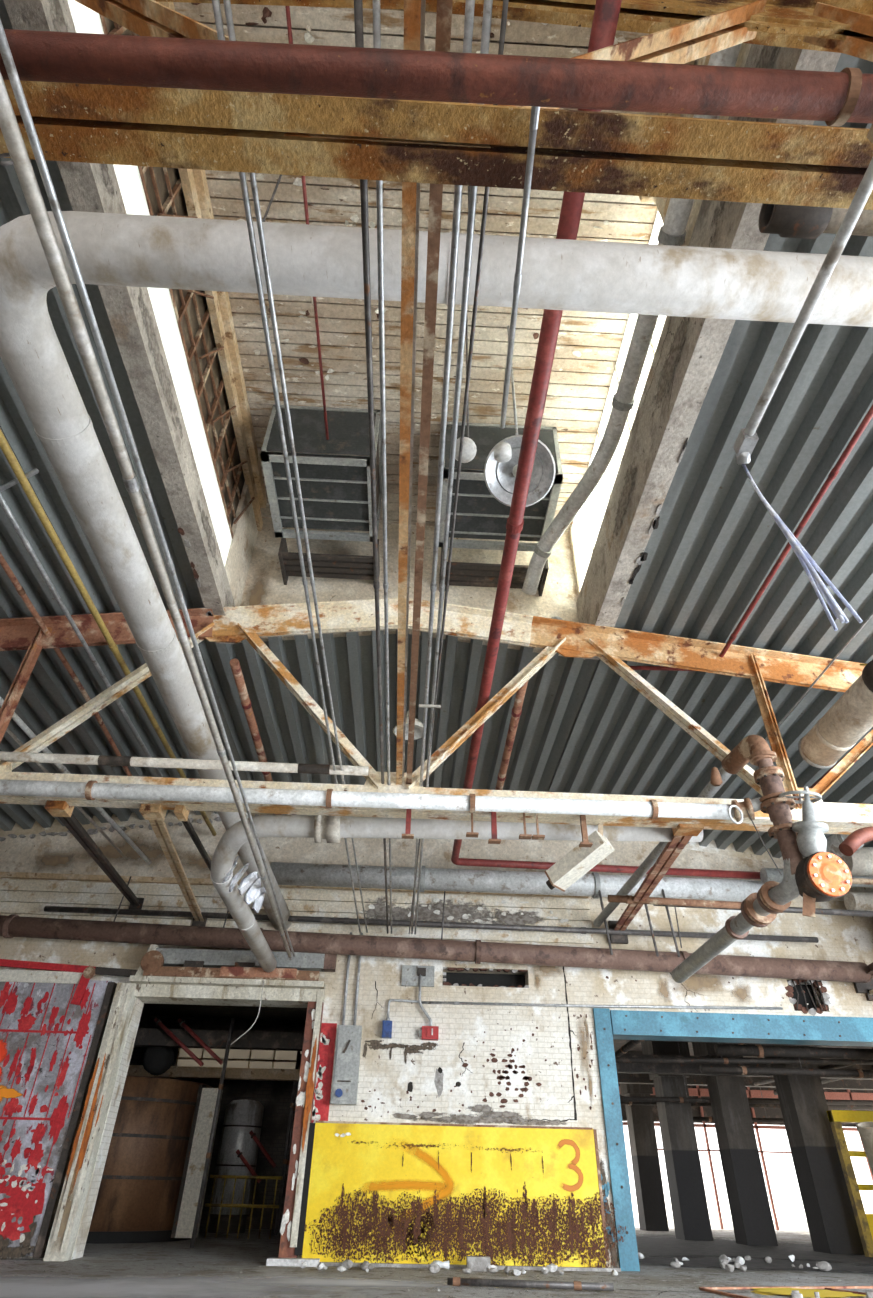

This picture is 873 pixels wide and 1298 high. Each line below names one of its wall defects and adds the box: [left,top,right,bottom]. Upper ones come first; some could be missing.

rust [0,29,873,127]
damp [365,897,543,925]
spalling [782,979,831,1016]
peeling [0,982,91,1242]
peeling [296,1009,351,1137]
spalling [450,1023,542,1115]
peeling [280,1209,292,1242]